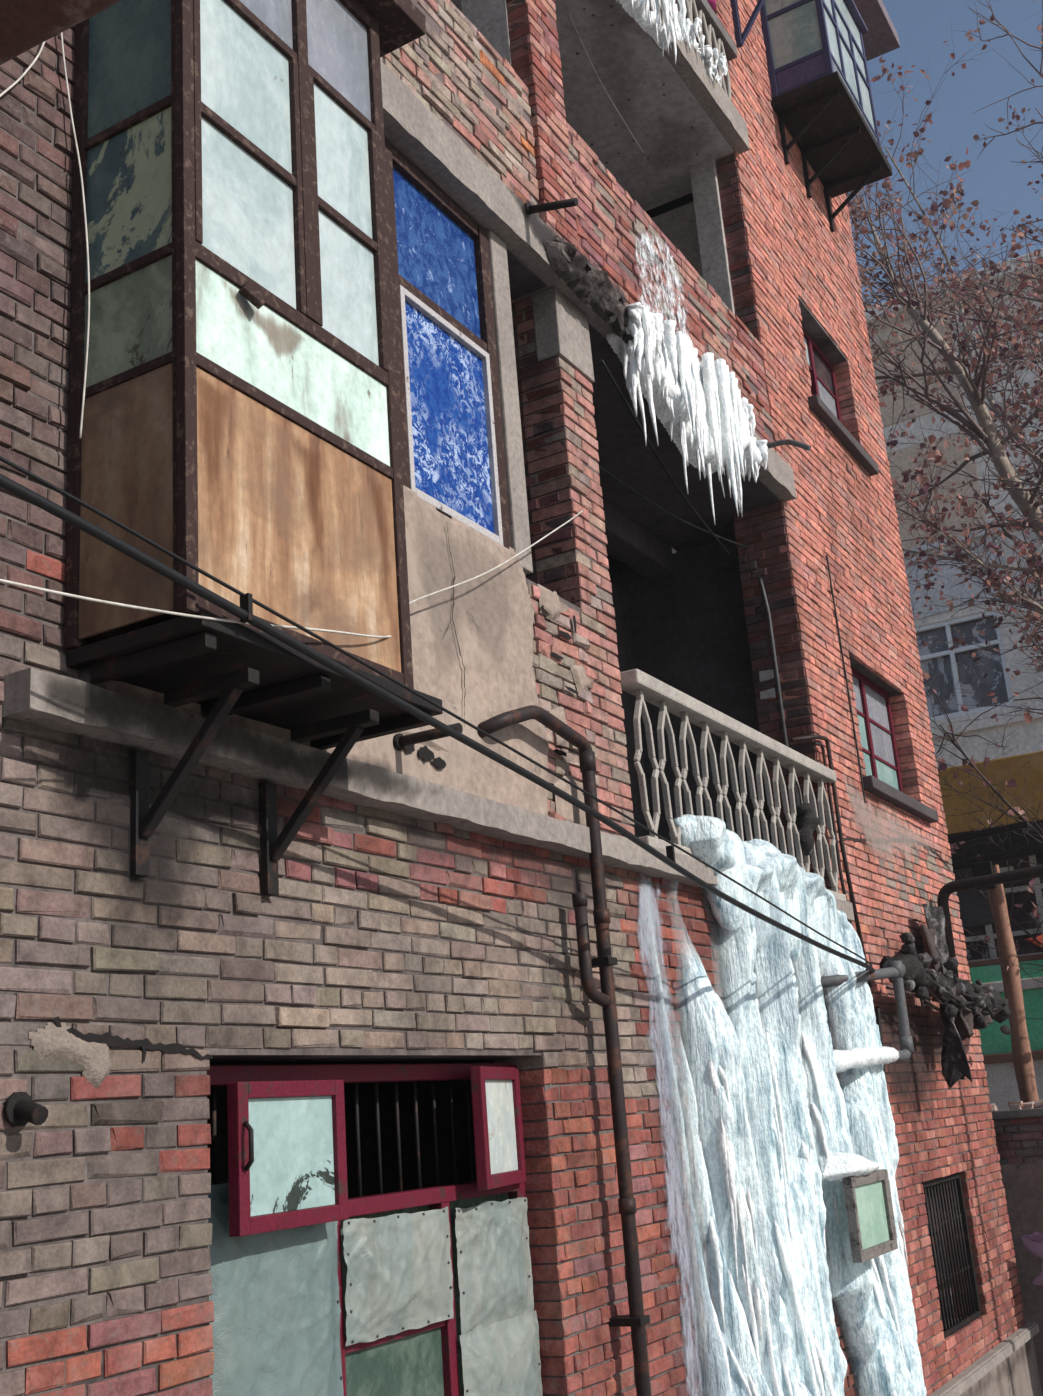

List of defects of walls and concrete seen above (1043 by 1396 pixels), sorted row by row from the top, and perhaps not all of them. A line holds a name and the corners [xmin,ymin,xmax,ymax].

spalling [509,184,634,344]
crack [444,522,466,727]
spalling [531,584,602,827]
crack [54,1016,213,1062]